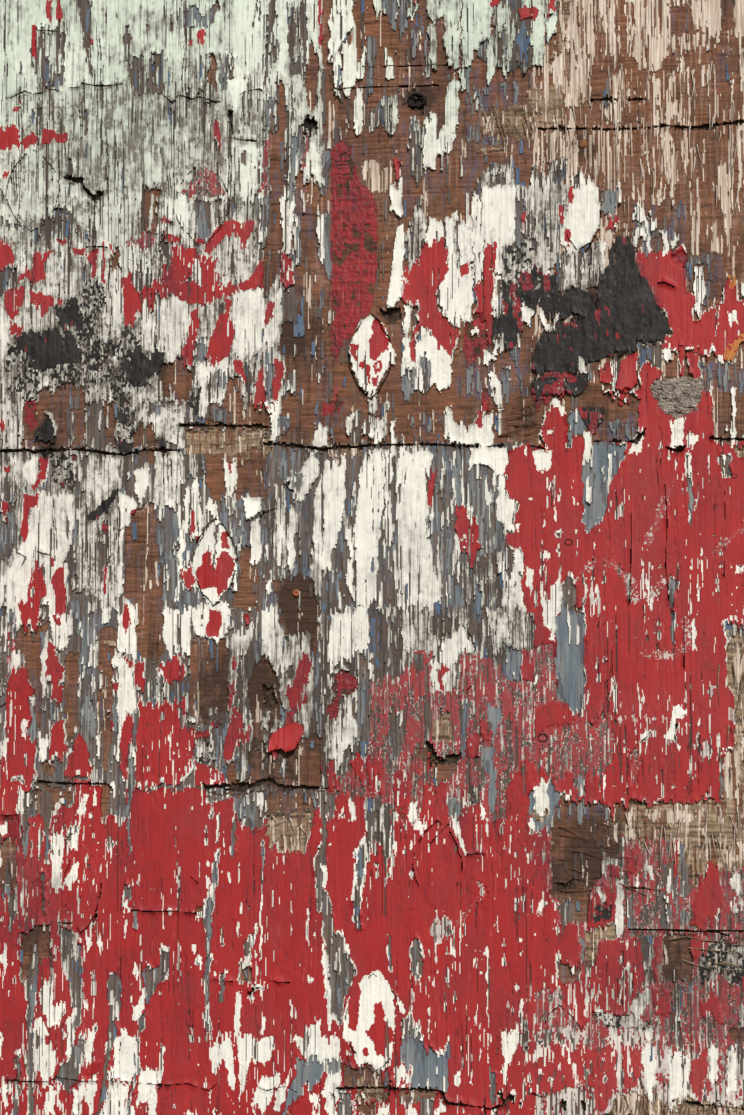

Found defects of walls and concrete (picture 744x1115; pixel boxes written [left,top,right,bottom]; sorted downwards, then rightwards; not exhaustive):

peeling [180,0,744,637]
crack [0,422,545,456]
crack [594,428,744,455]
peeling [124,498,167,663]
peeling [188,565,326,792]
crack [38,780,112,788]
crack [204,776,329,794]
peeling [547,621,744,918]
peeling [281,1032,450,1115]
crack [337,1084,542,1113]
crack [605,1097,744,1115]
peeling [608,1083,744,1115]